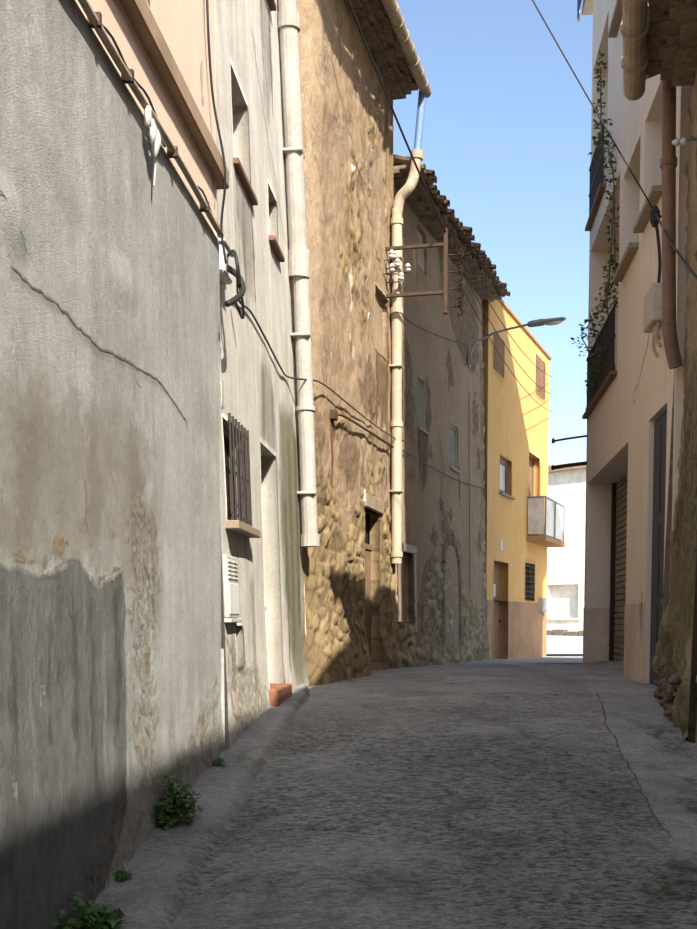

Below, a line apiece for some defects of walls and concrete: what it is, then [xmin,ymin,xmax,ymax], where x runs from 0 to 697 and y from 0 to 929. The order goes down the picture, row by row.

crack [11,266,187,421]
flaking render [315,408,369,507]
flaking render [402,328,415,431]
flaking render [437,242,490,652]
damp [0,559,127,929]
crack [549,693,670,835]